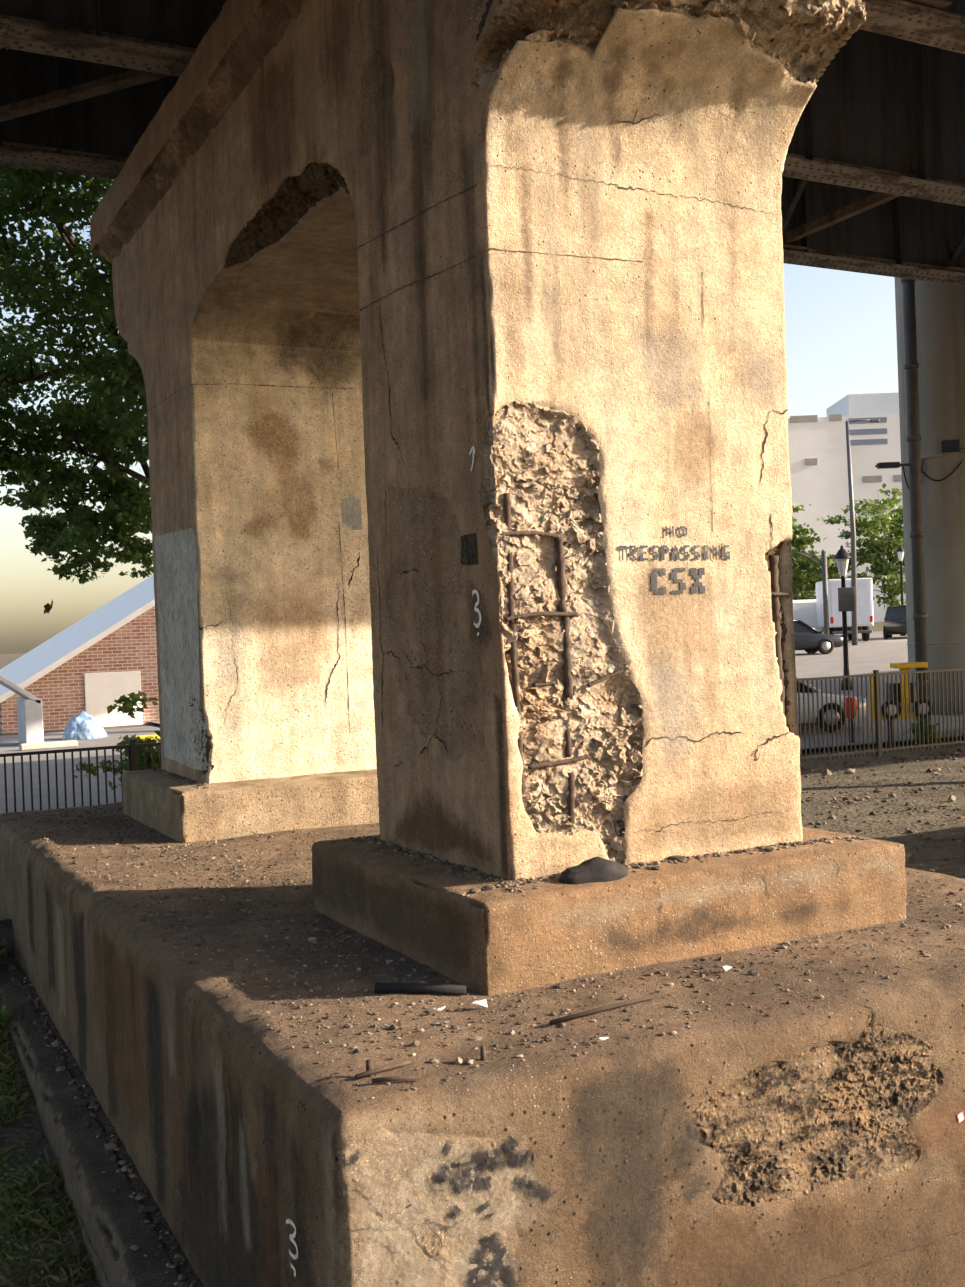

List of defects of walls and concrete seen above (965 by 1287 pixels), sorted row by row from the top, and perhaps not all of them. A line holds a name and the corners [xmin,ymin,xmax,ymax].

spalling [470,0,867,91]
spalling [224,162,350,268]
spalling [386,486,486,762]
spalling [478,401,644,864]
spalling [765,541,792,733]
crack [645,731,791,760]
water stain [27,866,86,1069]
water stain [131,976,171,1206]
water stain [180,1081,277,1287]
water stain [293,1152,308,1287]
water stain [571,1062,708,1287]
spalling [686,1015,944,1207]